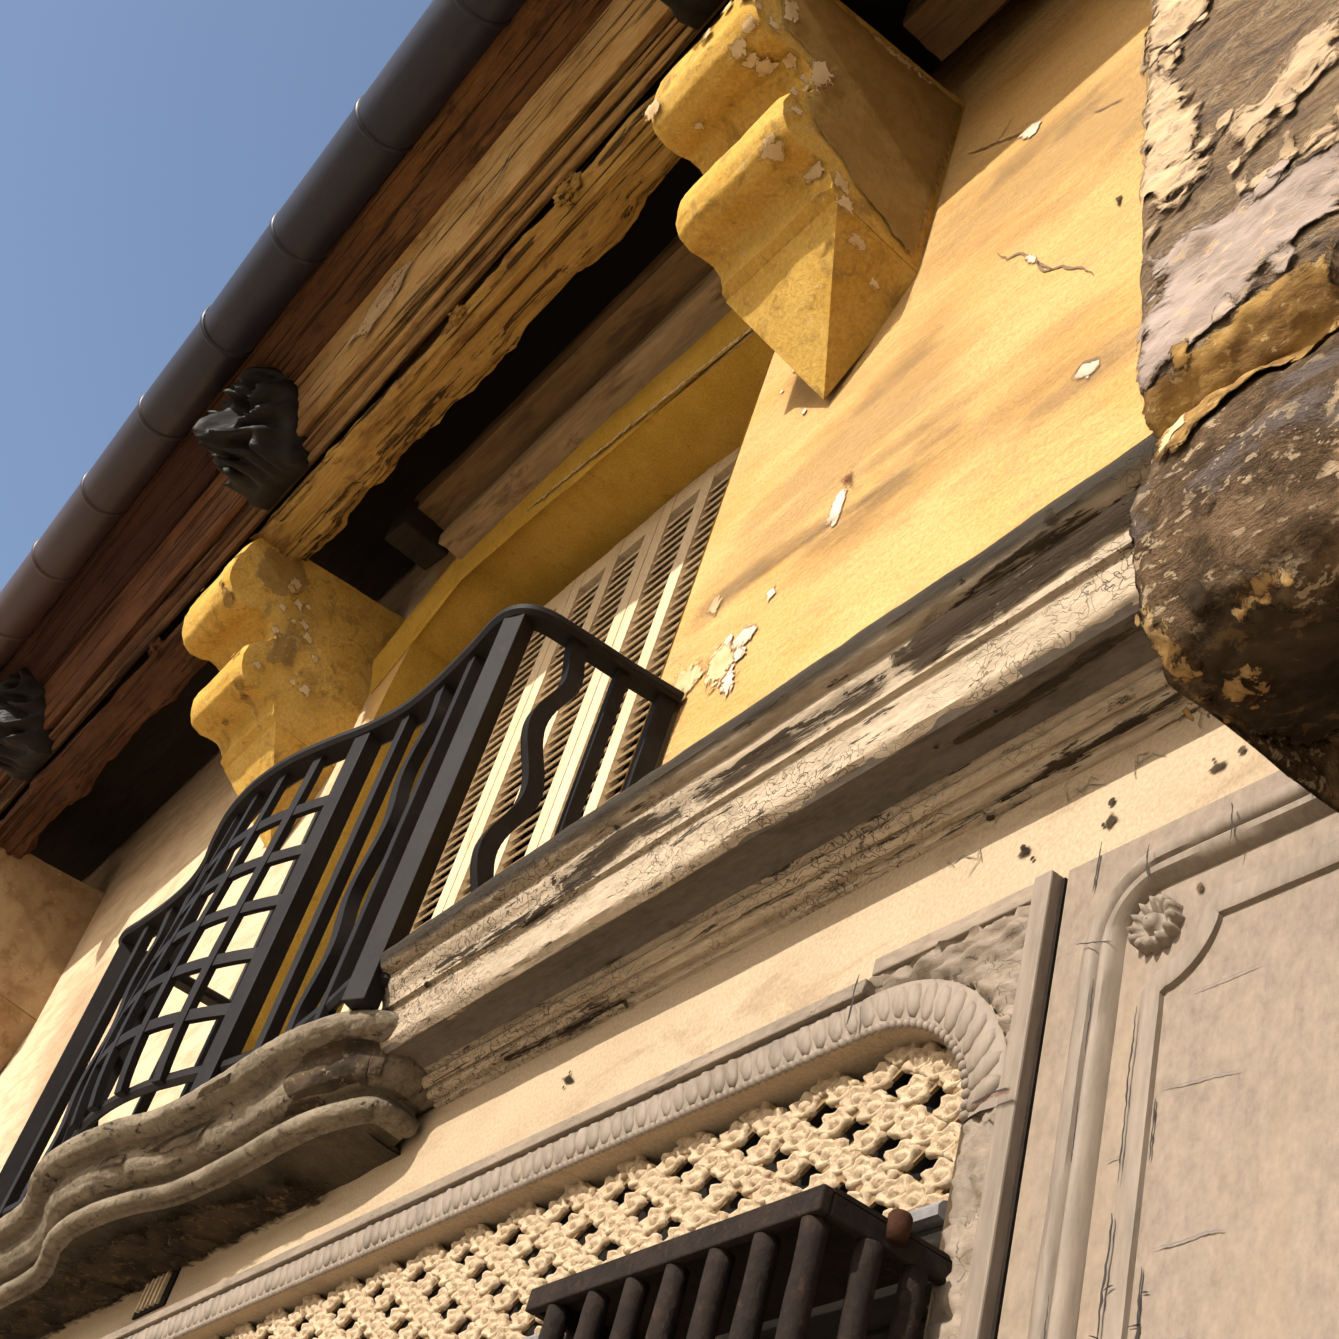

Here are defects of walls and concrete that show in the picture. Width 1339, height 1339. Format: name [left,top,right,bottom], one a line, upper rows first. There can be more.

peeling [642,97,660,122]
peeling [723,0,962,255]
crack [997,252,1093,275]
peeling [1136,0,1339,461]
spalling [1071,356,1100,381]
peeling [525,327,751,512]
spalling [824,471,852,527]
peeling [219,579,233,608]
peeling [250,533,320,697]
peeling [1231,566,1295,622]
peeling [423,484,1141,988]
peeling [500,991,634,1061]